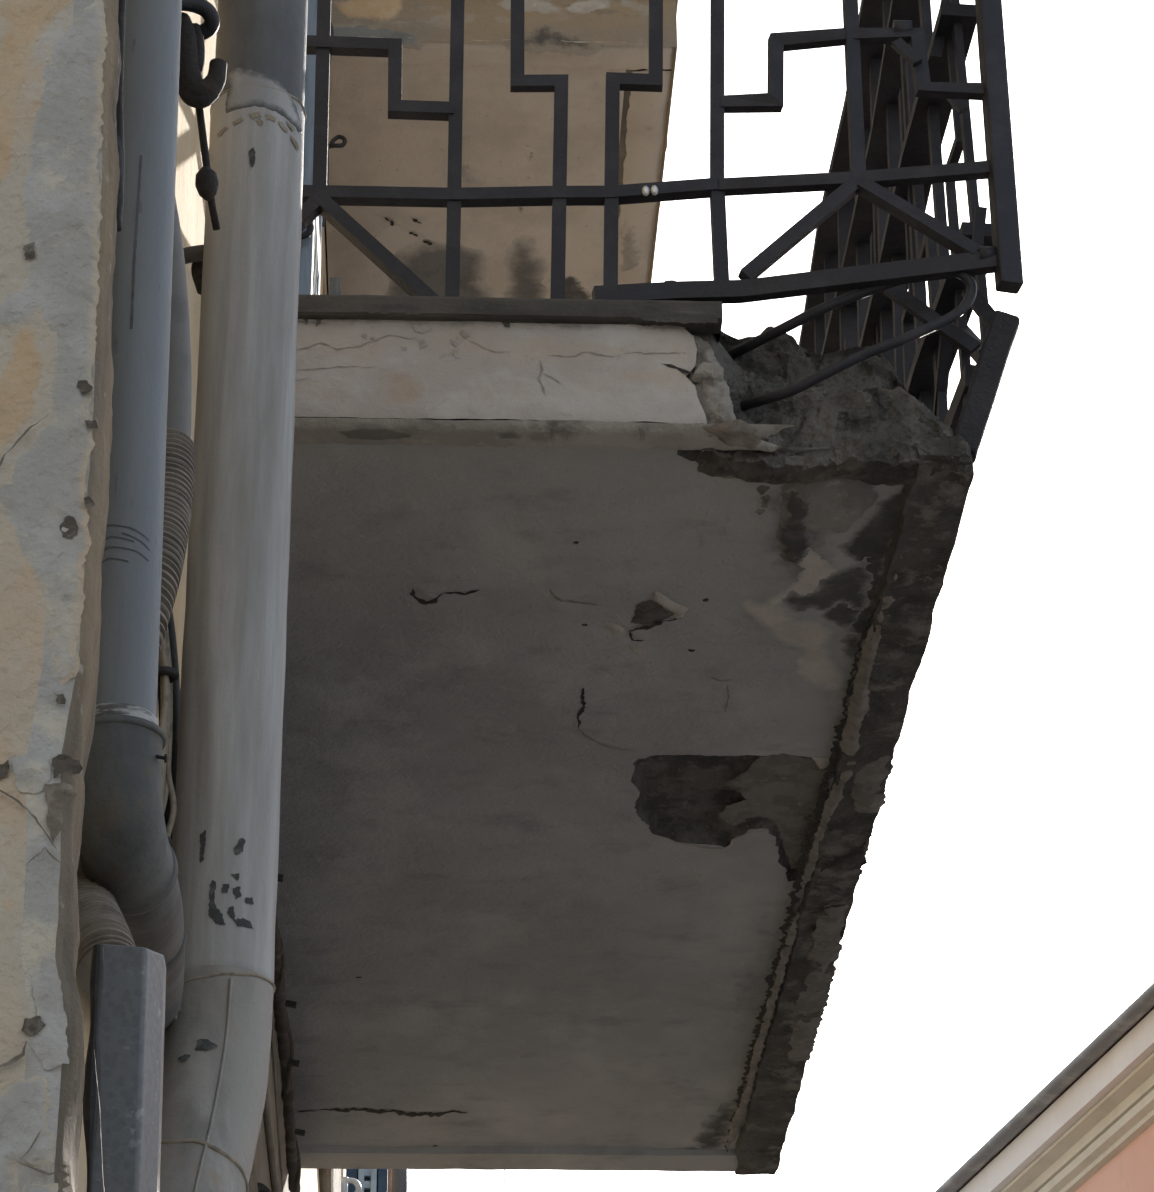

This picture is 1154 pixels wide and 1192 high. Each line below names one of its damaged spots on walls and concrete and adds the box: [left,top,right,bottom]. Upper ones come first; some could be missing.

leakage [394,238,446,296]
leakage [459,234,551,298]
leakage [565,276,592,299]
crack [538,352,694,396]
spalling [677,326,970,533]
crack [383,571,481,605]
leakage [750,483,905,685]
crack [577,688,632,751]
flaking render [628,548,895,886]
spalling [788,899,849,1061]
flaking render [726,912,800,1150]
crack [299,1107,466,1117]